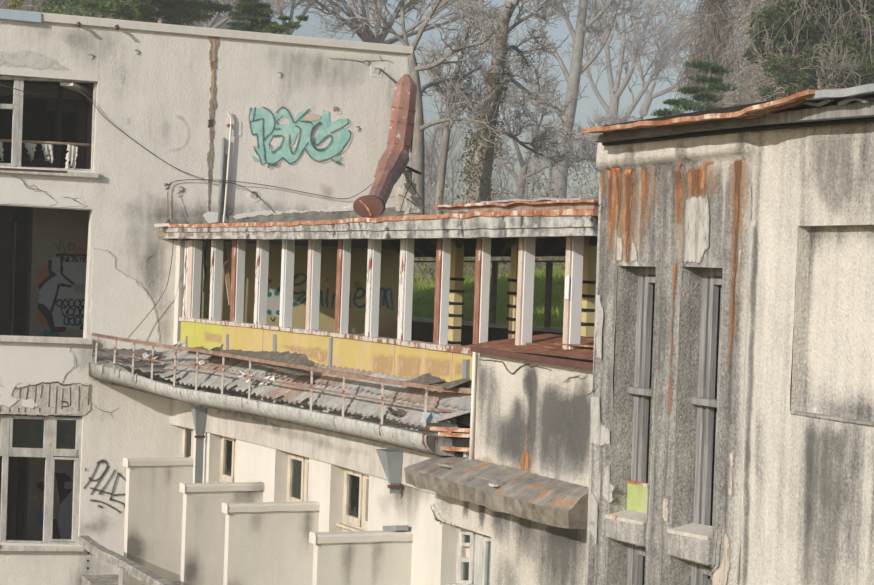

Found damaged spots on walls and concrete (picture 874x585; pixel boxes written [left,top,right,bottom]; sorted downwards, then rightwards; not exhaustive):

rust [581,88,846,133]
flaking render [0,174,87,207]
rust [598,165,654,262]
rust [675,161,715,222]
flaking render [684,196,709,264]
rust [728,157,748,355]
flaking render [0,342,91,416]
crack [478,358,595,397]
flaking render [706,527,739,585]